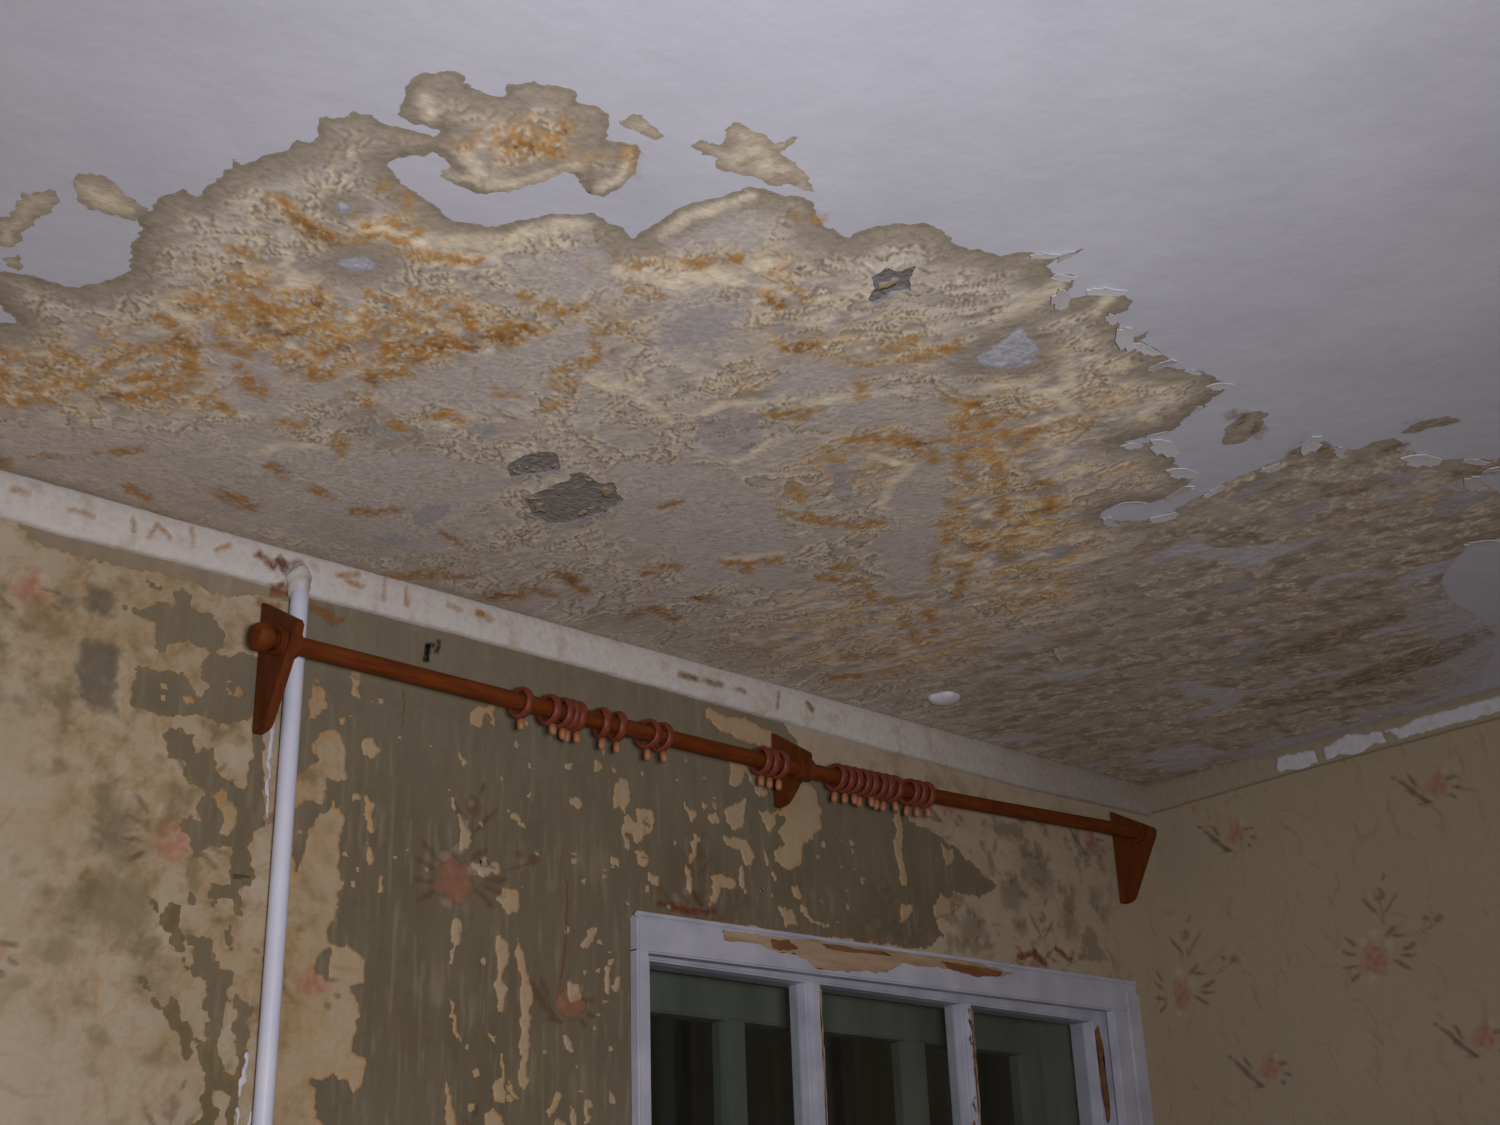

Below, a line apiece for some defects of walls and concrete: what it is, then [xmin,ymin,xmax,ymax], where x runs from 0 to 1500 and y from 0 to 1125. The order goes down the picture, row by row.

peeling [0,71,1500,786]
water stain [68,590,112,614]
rust [256,552,297,608]
water stain [76,642,117,708]
water stain [265,722,276,818]
flaking render [18,523,290,1125]
flaking render [292,598,1014,1125]
peeling [1094,1025,1110,1124]